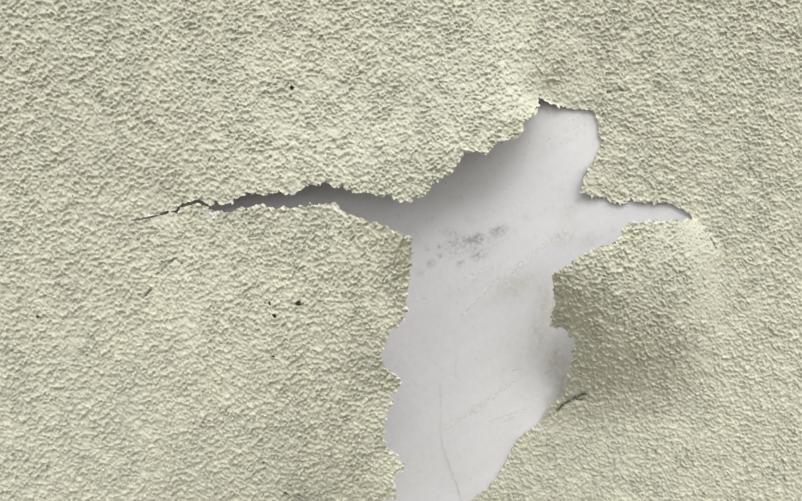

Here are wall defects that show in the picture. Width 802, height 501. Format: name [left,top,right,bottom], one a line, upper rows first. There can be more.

crack [131,182,404,235]
peeling [128,0,722,501]